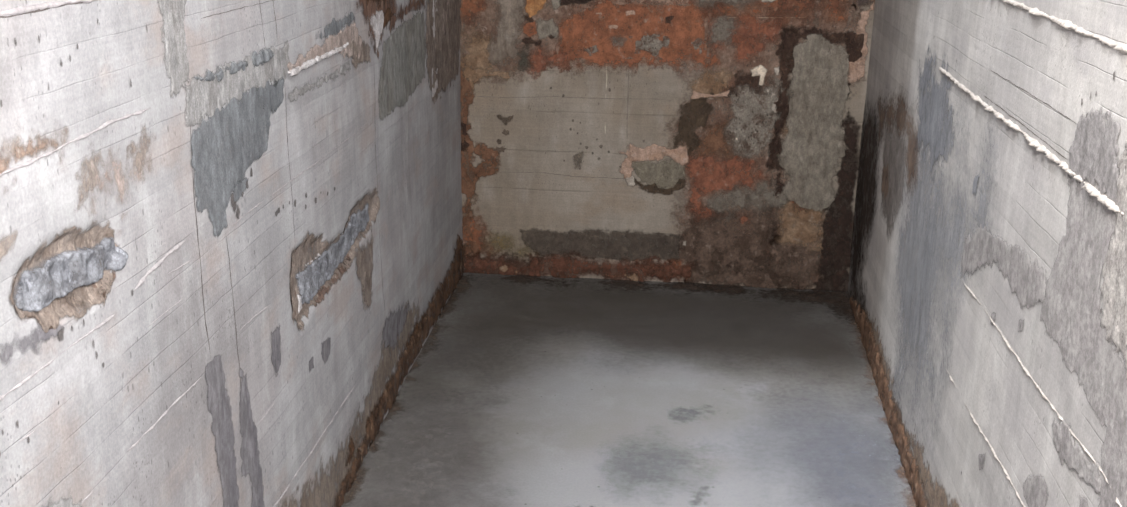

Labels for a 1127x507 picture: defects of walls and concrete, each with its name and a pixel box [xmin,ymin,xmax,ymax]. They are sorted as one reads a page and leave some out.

flaking render [517,0,785,75]
peeling [231,168,253,219]
spalling [563,119,610,169]
damp [673,93,713,157]
flaking render [684,121,766,223]
damp [427,104,878,377]
damp [382,303,409,350]
damp [363,411,481,507]